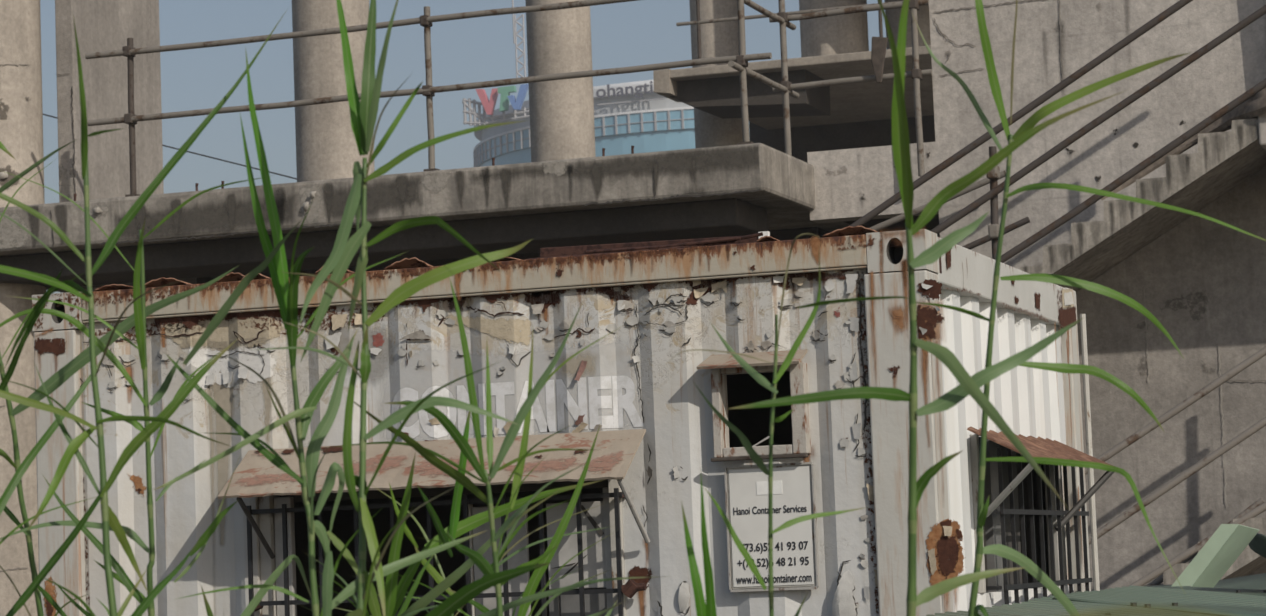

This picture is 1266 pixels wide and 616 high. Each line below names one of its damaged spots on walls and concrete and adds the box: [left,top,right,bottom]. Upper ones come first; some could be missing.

corrosion [32,280,274,366]
peeling [83,315,286,404]
corrosion [88,302,385,355]
peeling [325,324,439,380]
peeling [435,303,593,381]
corrosion [398,246,737,326]
peeling [607,293,684,423]
peeling [701,292,745,321]
corrosion [679,229,923,387]
peeling [829,269,871,457]
corrosion [891,249,982,438]
corrosion [926,519,966,612]